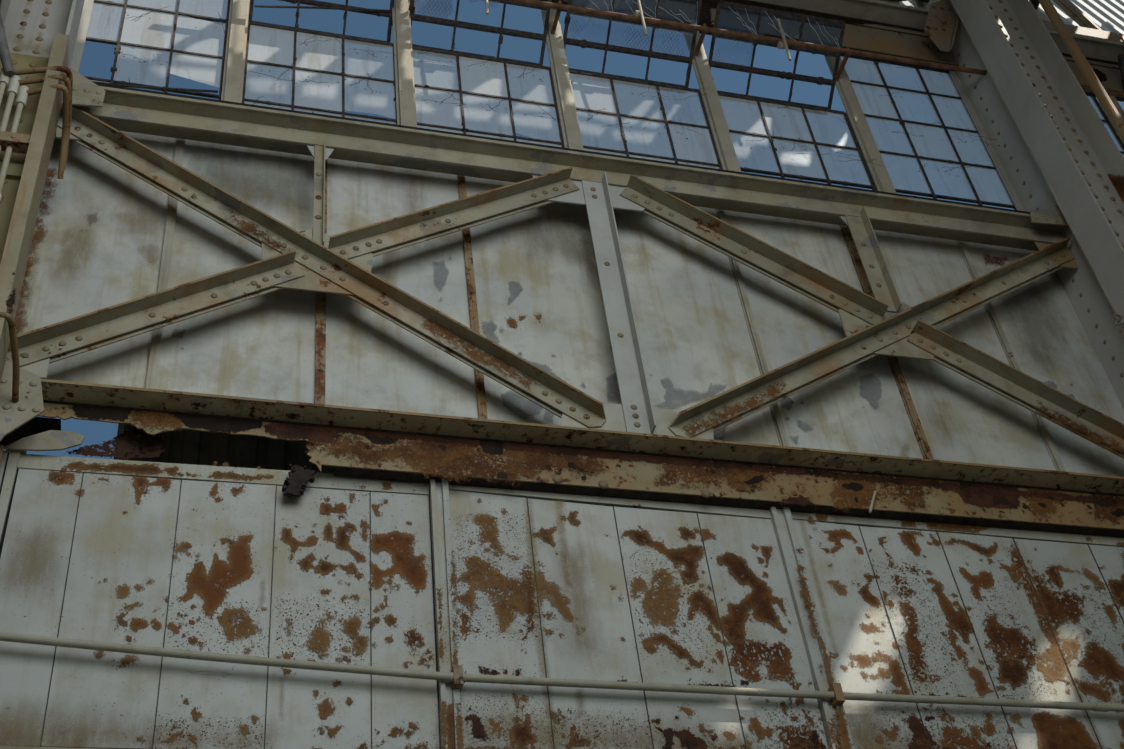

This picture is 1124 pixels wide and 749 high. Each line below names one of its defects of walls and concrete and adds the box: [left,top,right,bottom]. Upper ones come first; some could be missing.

peeling [507,281,523,318]
peeling [655,377,725,408]
peeling [857,370,883,409]
rust [37,405,1124,749]